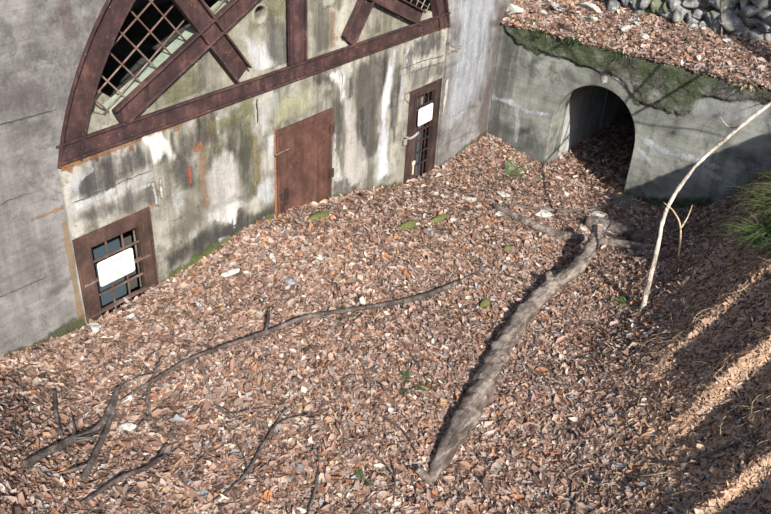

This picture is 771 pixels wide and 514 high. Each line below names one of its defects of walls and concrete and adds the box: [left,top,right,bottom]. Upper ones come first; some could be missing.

crack [0,109,56,125]
damp [72,118,219,217]
corrosion [60,104,233,172]
damp [169,120,275,268]
damp [313,33,440,192]